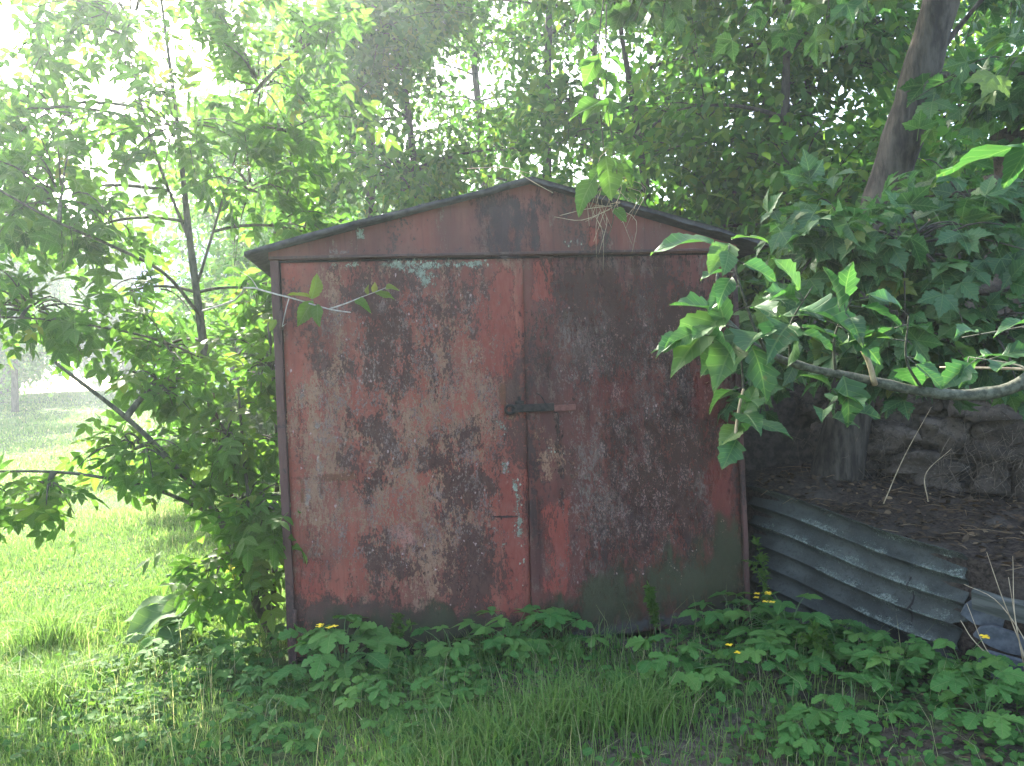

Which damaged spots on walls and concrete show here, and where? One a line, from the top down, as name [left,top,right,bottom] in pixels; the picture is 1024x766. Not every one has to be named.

corrosion [297,257,514,619]
water stain [472,183,739,597]